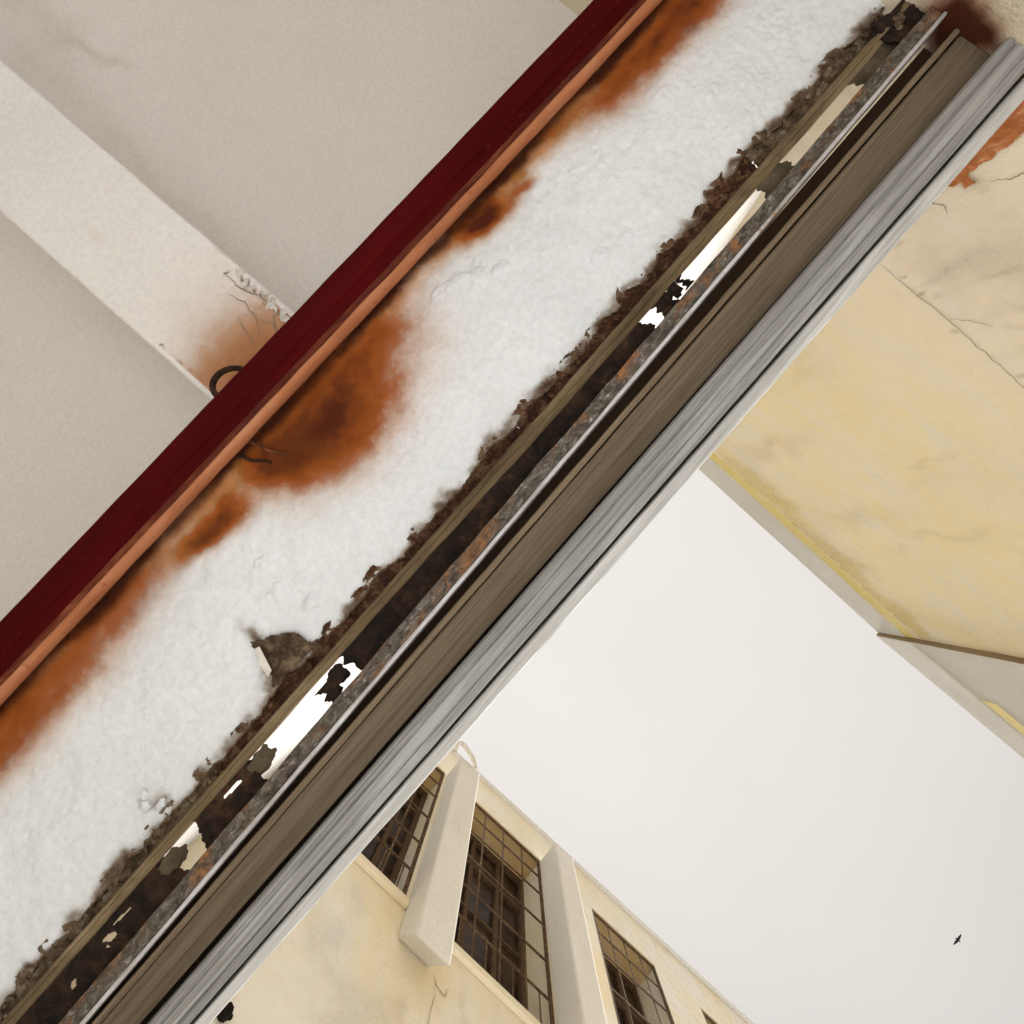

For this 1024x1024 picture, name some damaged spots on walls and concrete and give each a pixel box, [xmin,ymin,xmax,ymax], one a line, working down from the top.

corrosion [847,0,1000,86]
spalling [940,100,1024,195]
spalling [512,7,886,433]
crack [226,275,280,349]
spalling [224,265,290,322]
corrosion [0,0,725,772]
crack [879,263,1024,388]
spalling [0,421,523,1023]